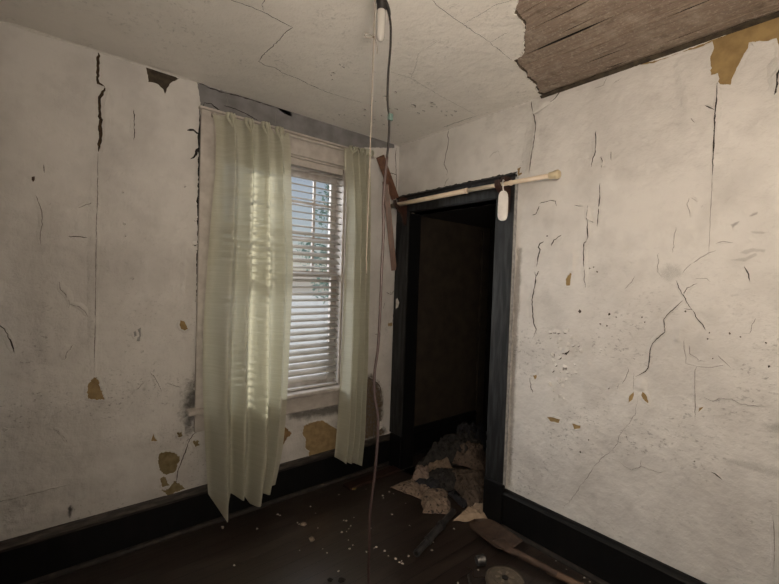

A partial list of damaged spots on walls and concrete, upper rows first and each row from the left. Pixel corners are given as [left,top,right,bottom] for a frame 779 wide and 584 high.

peeling [143,67,181,98]
crack [231,0,359,102]
peeling [540,11,779,99]
crack [69,87,105,358]
crack [563,88,733,508]
peeling [84,375,108,403]
peeling [149,432,187,496]
peeling [283,418,337,456]
water stain [365,375,386,440]